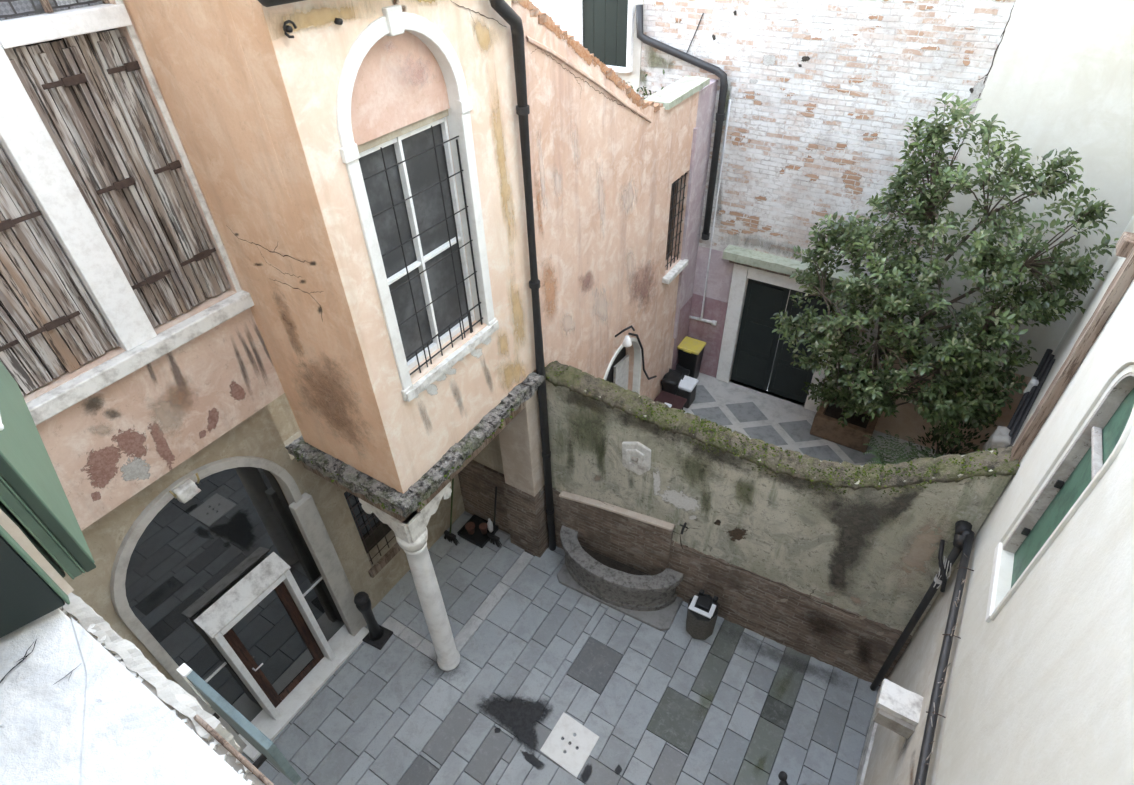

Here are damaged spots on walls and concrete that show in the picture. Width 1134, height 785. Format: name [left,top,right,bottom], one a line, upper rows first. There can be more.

crack [226,225,323,321]
leakage [168,354,189,409]
peeling [199,408,219,438]
peeling [229,381,246,400]
leakage [235,326,272,384]
leakage [305,372,352,435]
leakage [621,415,672,437]
peeling [80,423,175,502]
leakage [595,443,604,480]
leakage [683,442,754,513]
leakage [775,473,917,620]